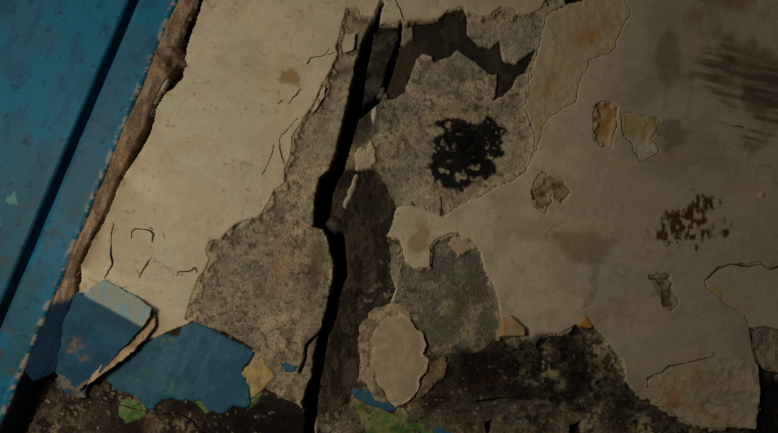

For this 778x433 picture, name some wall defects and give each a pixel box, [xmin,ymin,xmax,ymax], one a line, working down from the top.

crack [184,0,203,43]
crack [153,80,175,119]
crack [262,122,294,174]
mould [427,108,506,192]
crack [104,222,165,278]
spalling [27,8,375,433]
crack [299,0,404,433]
spalling [317,0,778,433]
rust [657,195,729,250]
mould [501,336,544,376]
mould [507,360,602,410]
damp [747,368,778,433]